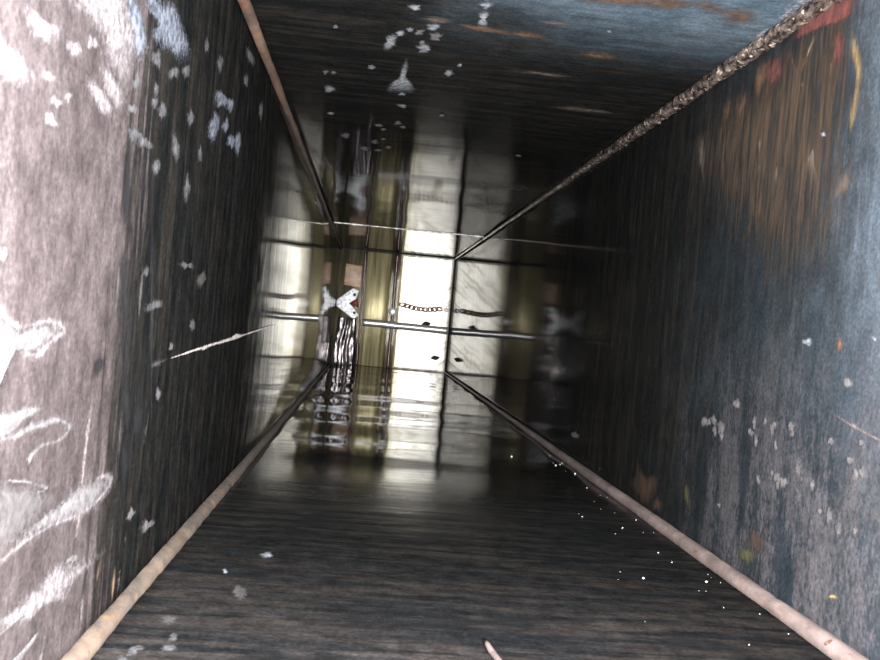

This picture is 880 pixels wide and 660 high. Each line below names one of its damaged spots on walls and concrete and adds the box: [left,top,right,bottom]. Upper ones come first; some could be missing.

corrosion [594,0,754,22]
water stain [123,144,131,225]
water stain [120,189,154,487]